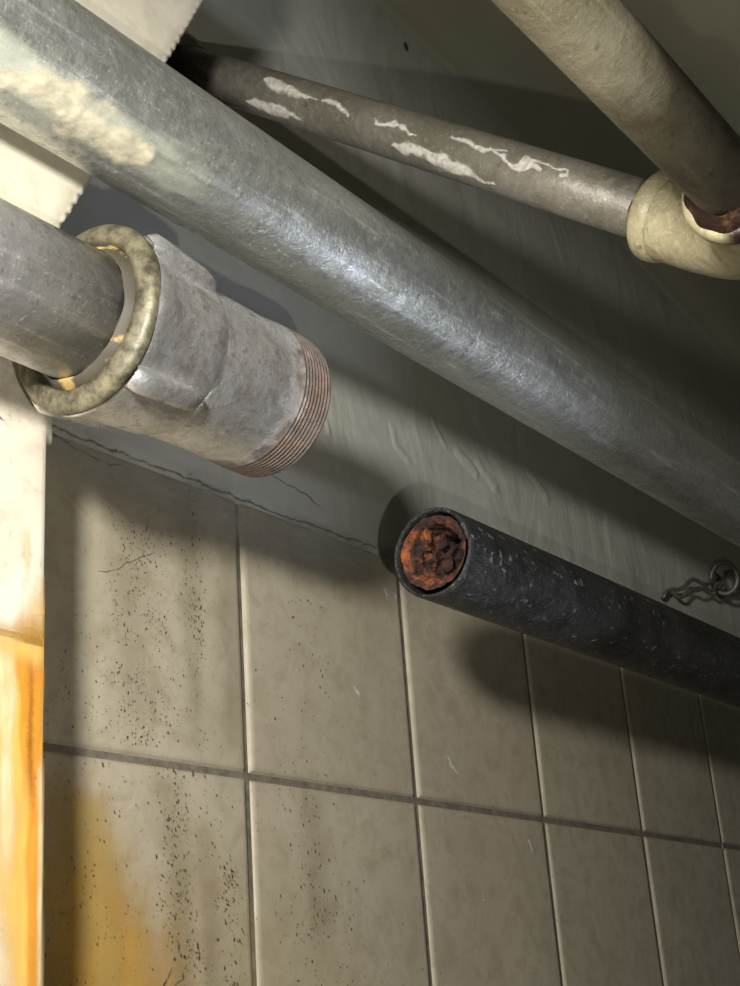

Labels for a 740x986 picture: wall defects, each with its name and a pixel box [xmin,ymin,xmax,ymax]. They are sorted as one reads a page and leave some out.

leakage [82,471,215,747]
crack [47,425,378,548]
corrosion [0,617,150,986]
leakage [85,764,251,986]